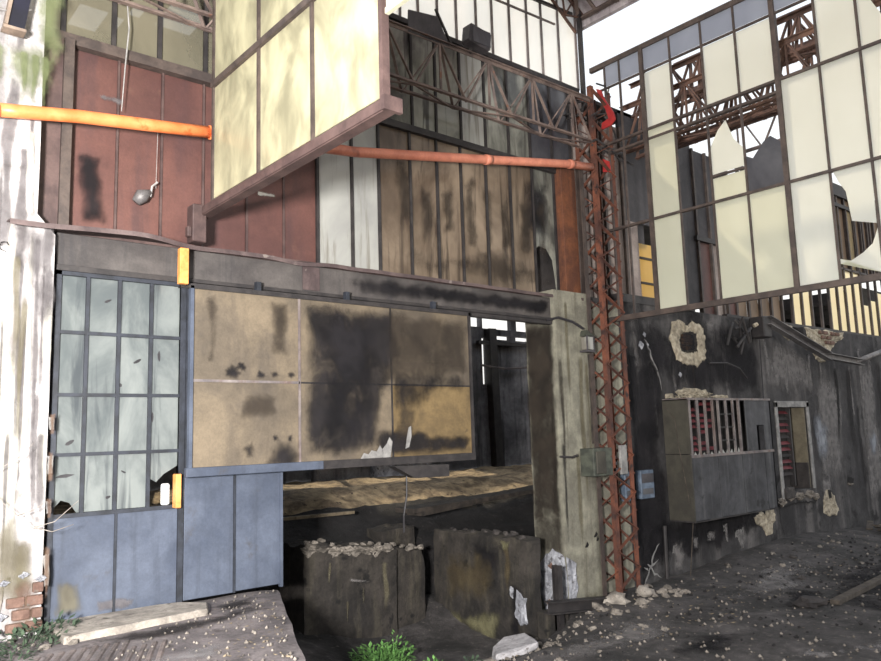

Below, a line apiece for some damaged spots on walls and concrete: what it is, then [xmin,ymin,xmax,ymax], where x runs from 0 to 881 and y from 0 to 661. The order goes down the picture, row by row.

damp [7,52,49,104]
damp [0,118,53,598]
spalling [668,319,706,367]
spalling [804,327,844,363]
spalling [540,549,579,610]
peeling [672,544,684,568]
peeling [694,524,746,547]
spalling [754,489,839,536]